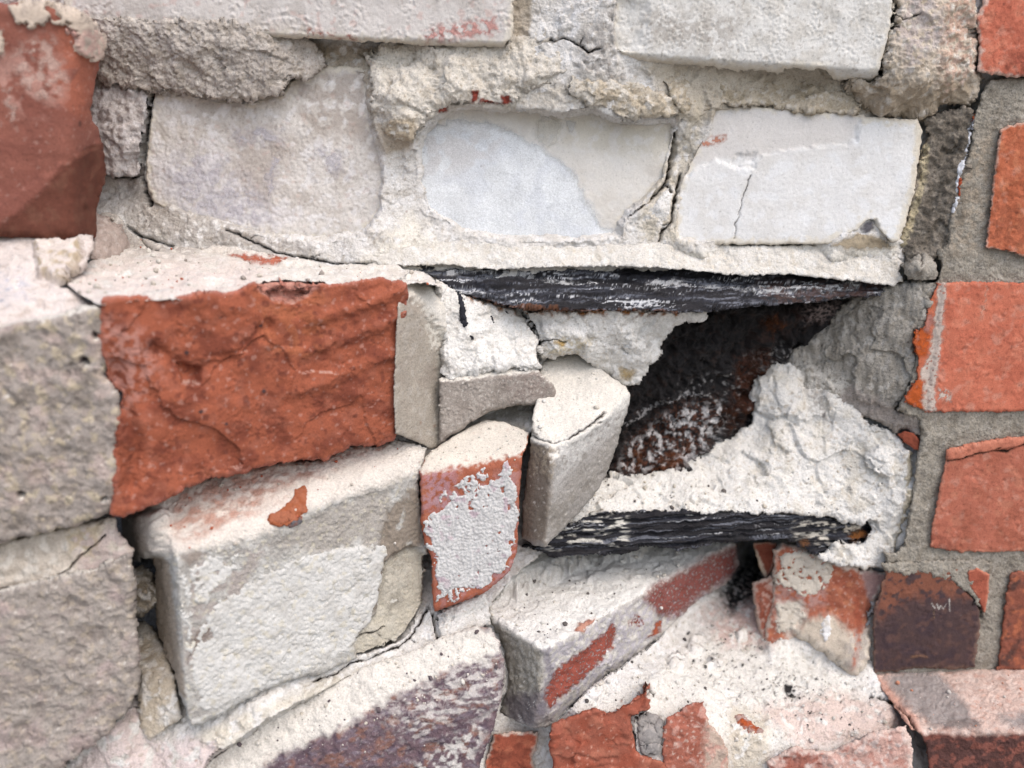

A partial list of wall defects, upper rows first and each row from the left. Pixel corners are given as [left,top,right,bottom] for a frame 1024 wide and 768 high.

crack [637,132,680,242]
crack [226,230,367,265]
spalling [607,300,844,478]
corrosion [727,355,769,429]
corrosion [660,448,688,470]
peeling [423,460,519,603]